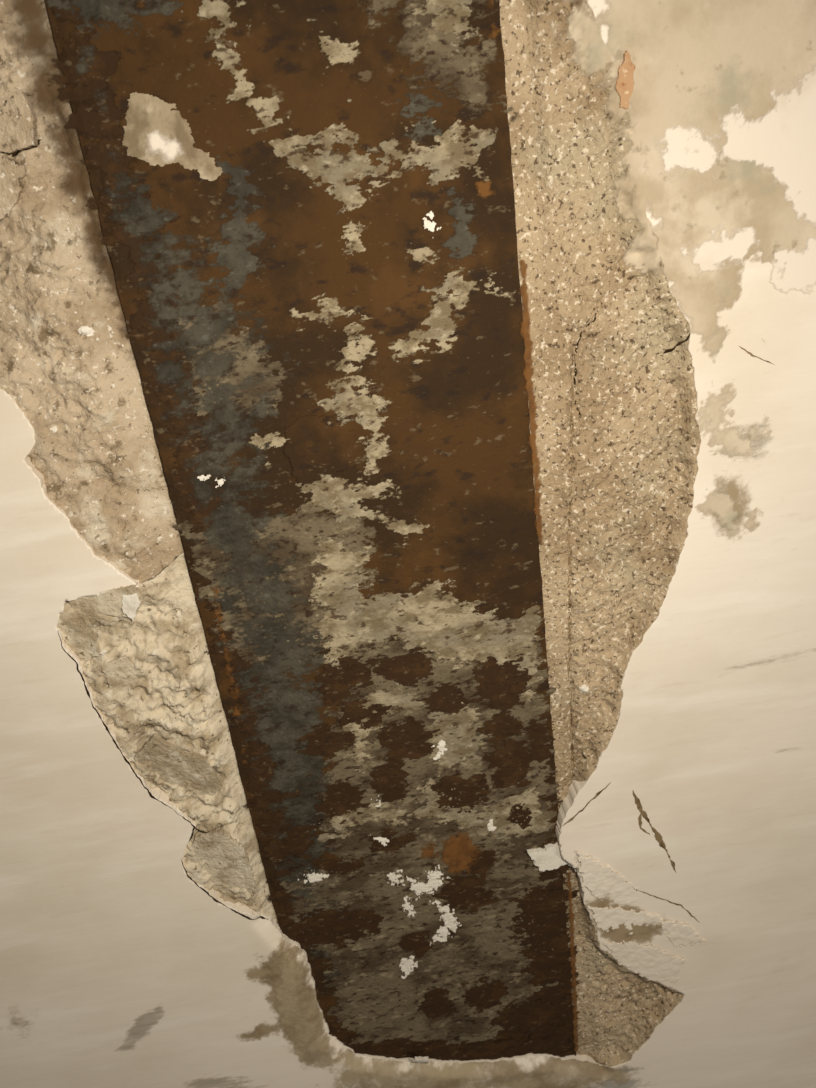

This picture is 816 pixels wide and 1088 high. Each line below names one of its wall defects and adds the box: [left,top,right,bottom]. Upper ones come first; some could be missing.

crack [2,139,41,157]
peeling [122,92,266,295]
peeling [197,0,289,134]
peeling [269,0,498,215]
peeling [388,266,516,362]
peeling [317,322,392,475]
corrosion [12,0,581,1061]
leakage [713,481,747,524]
leakage [120,1008,163,1049]
spalling [274,851,707,1088]
leakage [589,898,662,944]
crack [626,881,699,922]